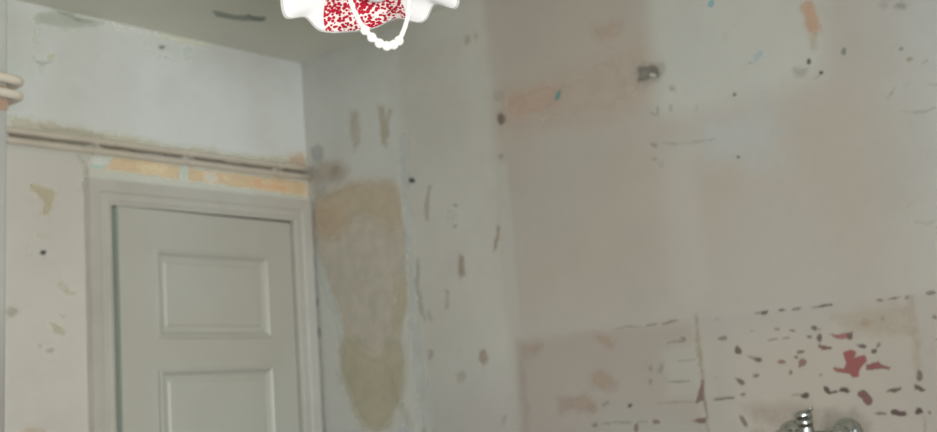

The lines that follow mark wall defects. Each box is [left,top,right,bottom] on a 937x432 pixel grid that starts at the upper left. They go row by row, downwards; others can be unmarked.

peeling [92,157,407,431]
peeling [808,326,890,377]
peeling [824,386,931,416]